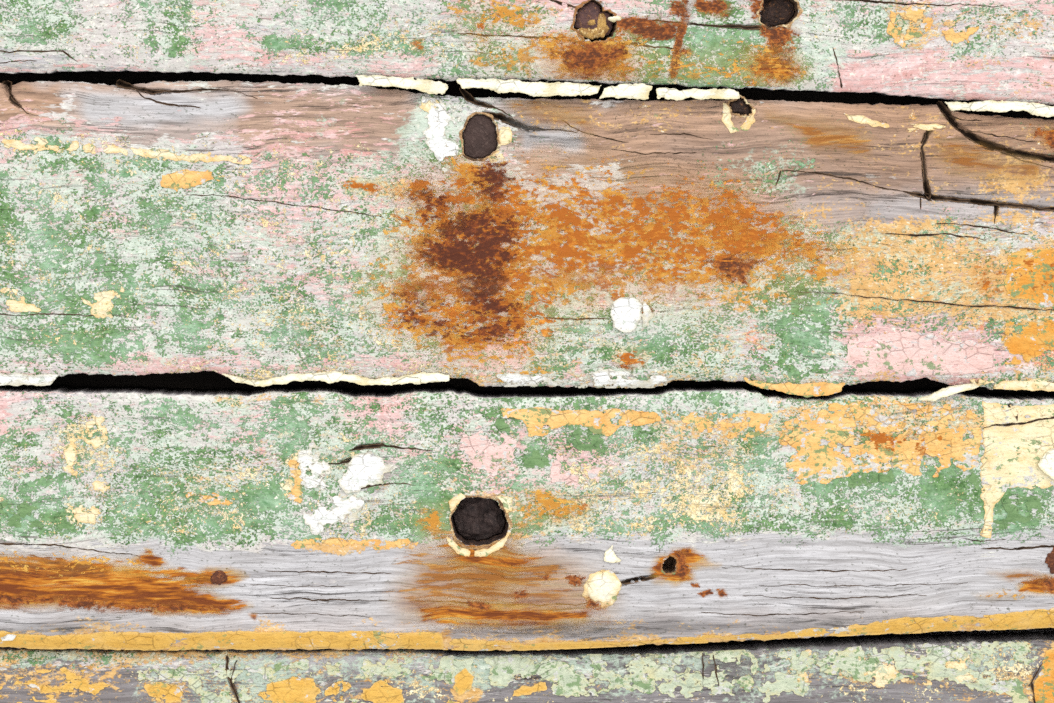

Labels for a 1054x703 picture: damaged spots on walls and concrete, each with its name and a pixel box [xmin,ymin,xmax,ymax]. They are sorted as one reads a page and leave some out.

corrosion [447,0,807,86]
crack [116,79,258,108]
crack [459,86,708,155]
corrosion [343,151,875,383]
peeling [496,369,668,388]
peeling [743,247,1054,538]
peeling [459,407,772,490]
peeling [287,439,418,550]
corrosion [0,548,256,619]
corrosion [388,489,602,625]
corrosion [652,549,727,597]
peeling [0,608,1054,703]